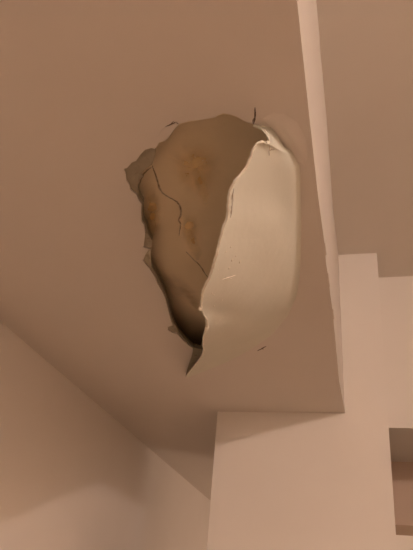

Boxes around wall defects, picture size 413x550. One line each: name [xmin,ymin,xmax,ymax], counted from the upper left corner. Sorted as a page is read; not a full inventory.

crack [140,166,181,234]
peeling [125,123,203,375]